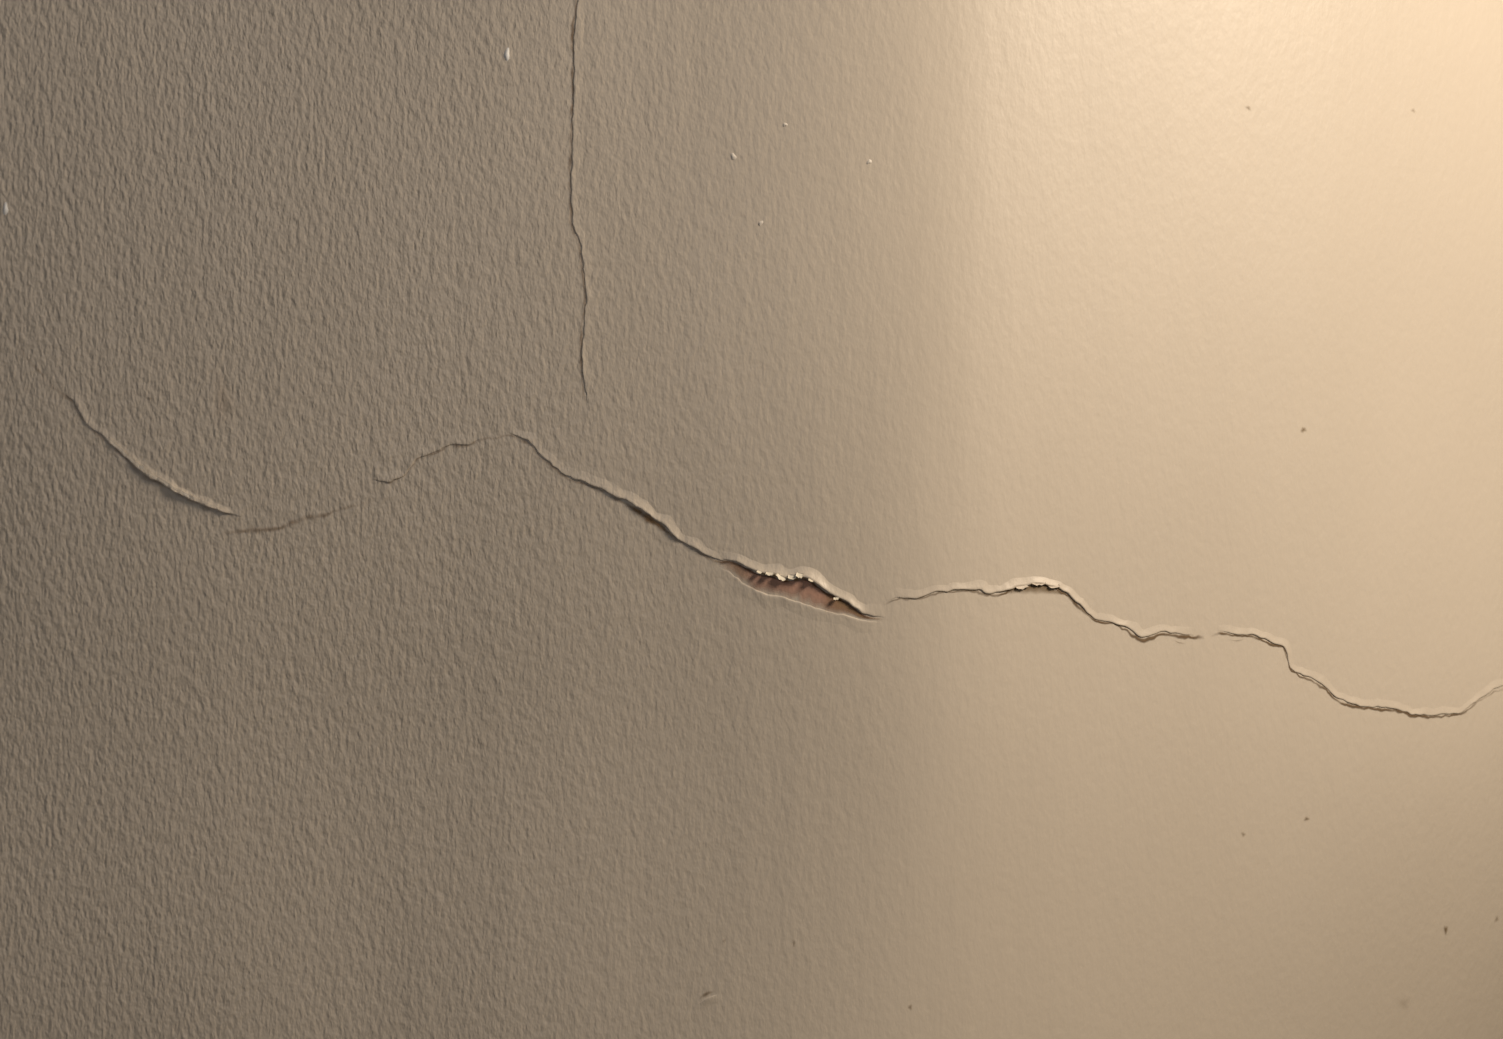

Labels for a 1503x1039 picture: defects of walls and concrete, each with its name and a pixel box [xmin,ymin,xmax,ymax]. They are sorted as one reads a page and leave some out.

spalling [709,548,886,634]
crack [884,576,1503,718]